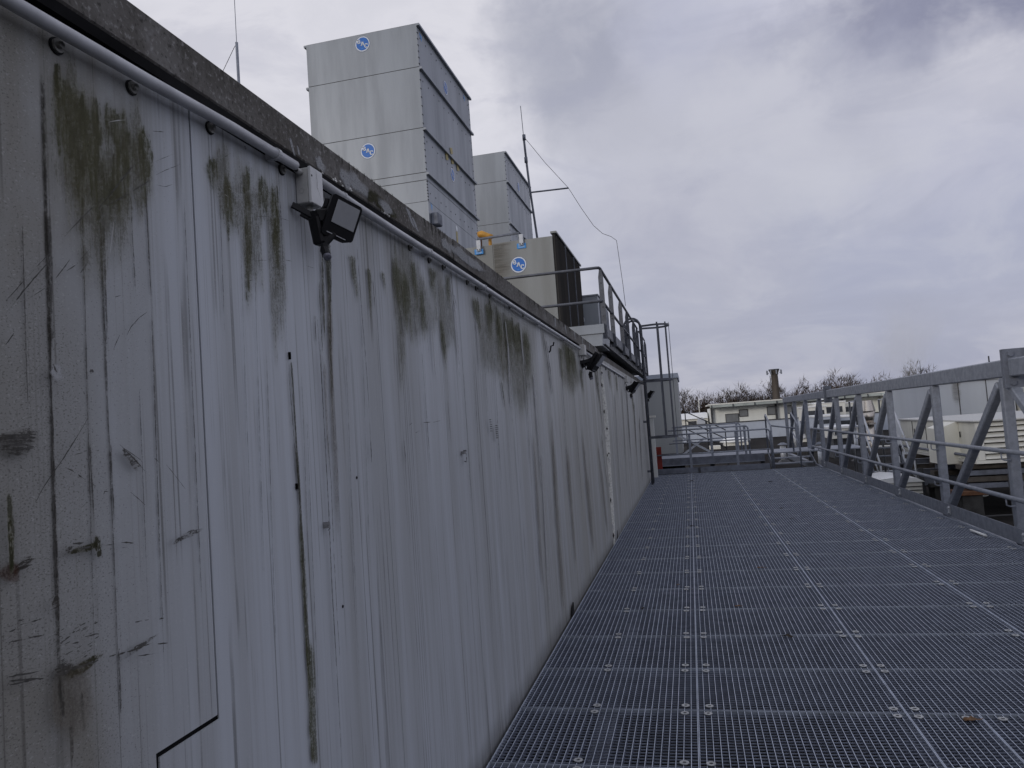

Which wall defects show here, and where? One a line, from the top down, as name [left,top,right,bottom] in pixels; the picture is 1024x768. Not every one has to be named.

water stain [41,64,153,656]
water stain [207,156,285,301]
water stain [349,253,459,456]
water stain [464,299,556,587]